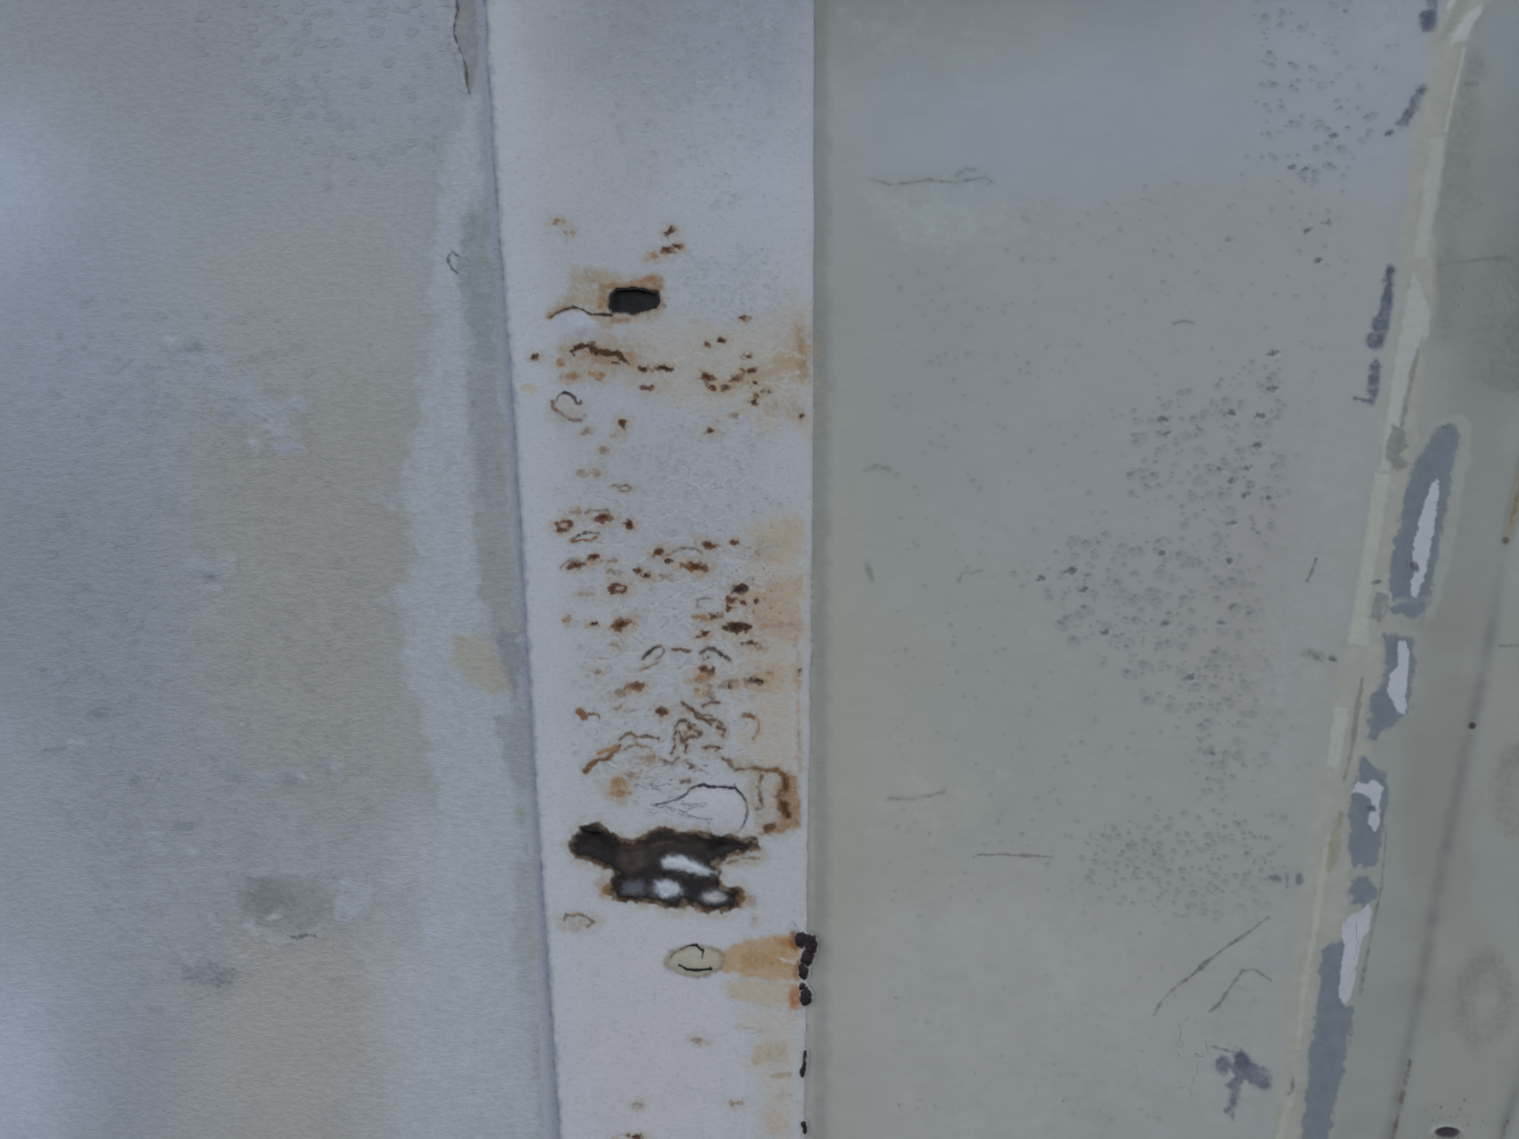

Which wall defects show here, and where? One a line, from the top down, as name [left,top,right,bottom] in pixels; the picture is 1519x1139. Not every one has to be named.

crack [446,0,471,97]
rust [543,212,584,243]
rust [523,217,838,726]
rust [1501,458,1519,545]
rust [557,751,819,1139]
peeling [1291,408,1475,1139]